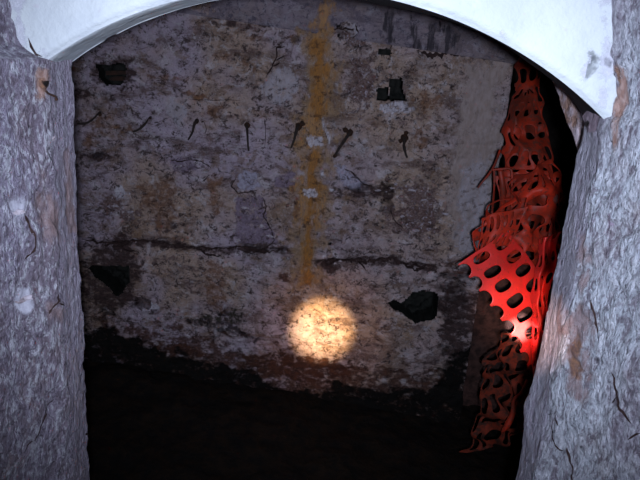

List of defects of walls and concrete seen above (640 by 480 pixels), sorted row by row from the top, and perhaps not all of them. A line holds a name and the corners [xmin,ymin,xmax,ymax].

rust [35,68,49,99]
hole [96,63,127,86]
rust [290,0,336,286]
peeling [335,48,510,261]
hole [88,265,130,296]
crack [323,256,437,273]
hole [388,290,439,324]
crack [611,372,640,440]